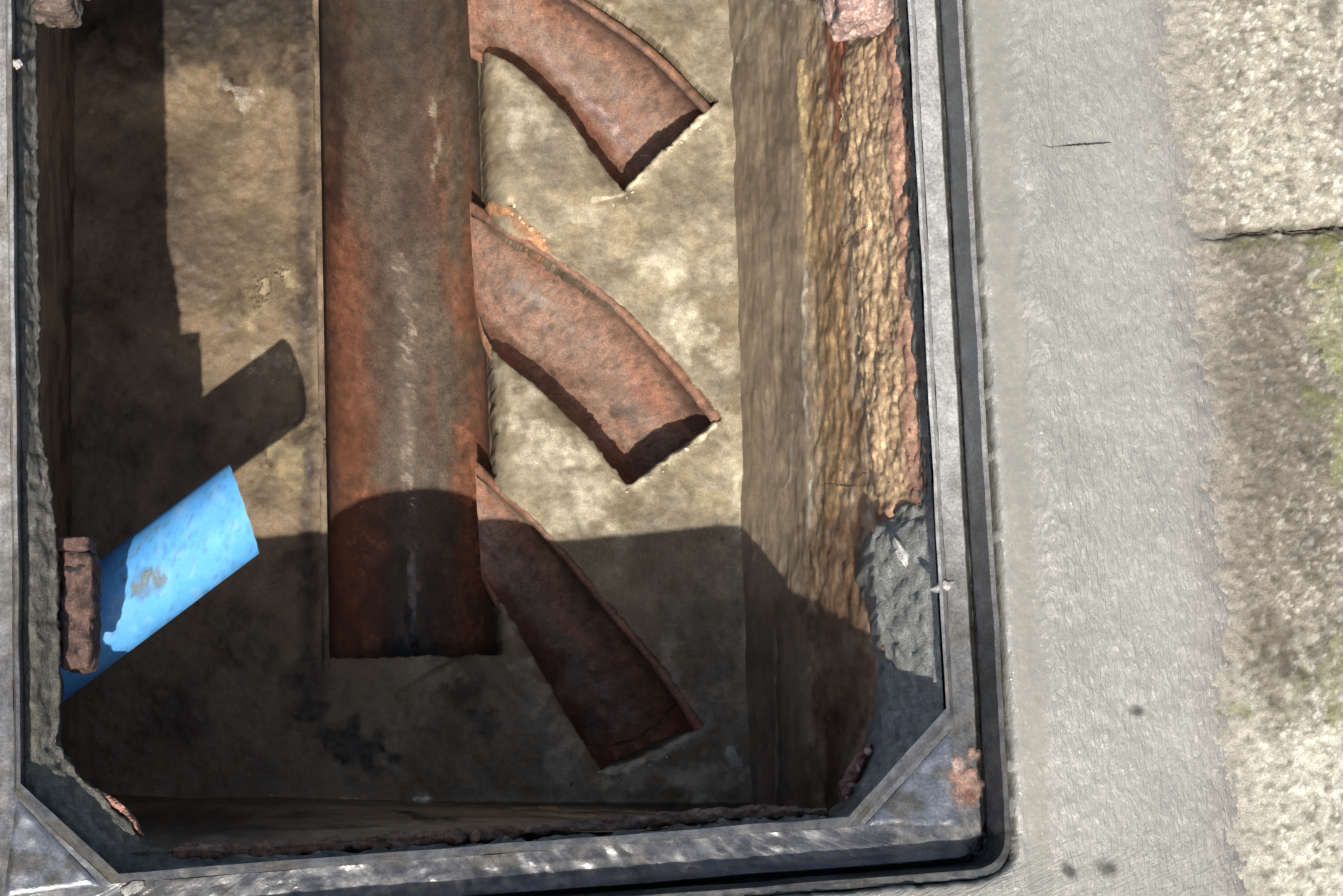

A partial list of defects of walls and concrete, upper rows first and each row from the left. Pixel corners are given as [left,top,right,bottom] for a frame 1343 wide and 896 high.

corrosion [826,22,848,144]
corrosion [454,422,484,598]
spalling [839,743,873,801]
corrosion [949,748,981,805]